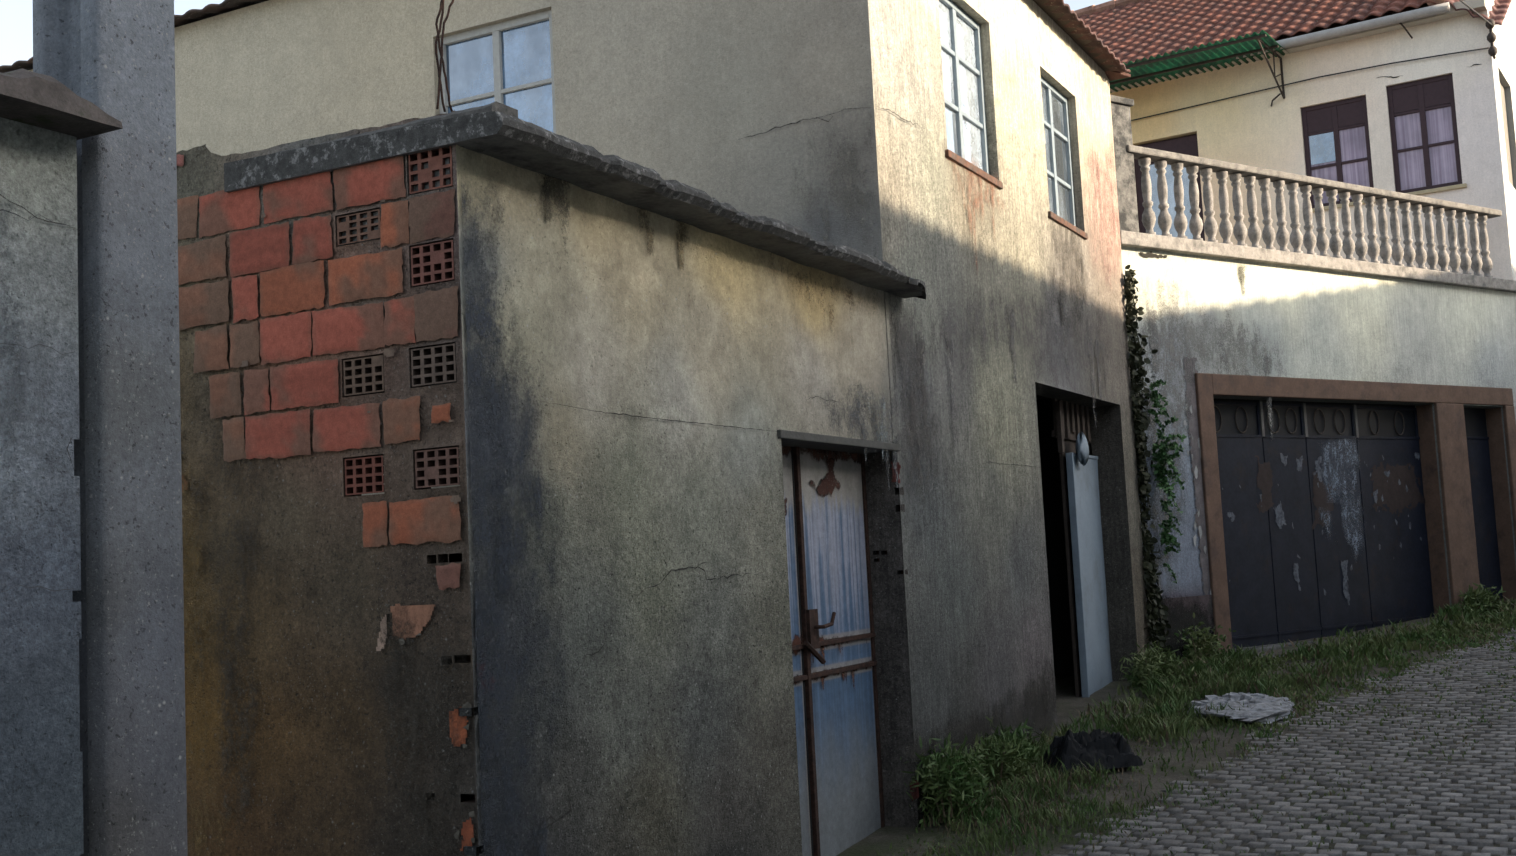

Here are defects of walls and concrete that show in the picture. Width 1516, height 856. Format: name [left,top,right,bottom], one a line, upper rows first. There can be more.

crack [738,107,923,140]
crack [0,194,80,231]
flaking render [177,156,458,462]
rust [782,446,862,497]
water stain [386,185,565,856]
peeling [1259,485,1294,529]
peeling [1280,438,1422,605]
flaking render [362,495,462,651]
crack [629,562,758,596]